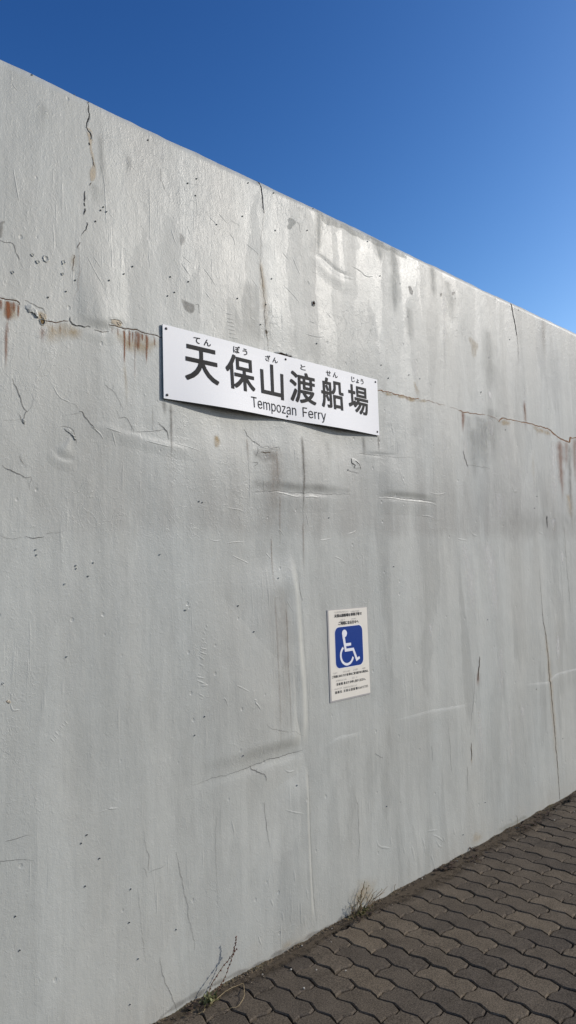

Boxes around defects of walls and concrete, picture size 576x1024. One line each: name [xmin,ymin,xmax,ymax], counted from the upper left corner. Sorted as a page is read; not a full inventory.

crack [81,101,95,236]
crack [0,295,162,359]
crack [378,385,576,484]